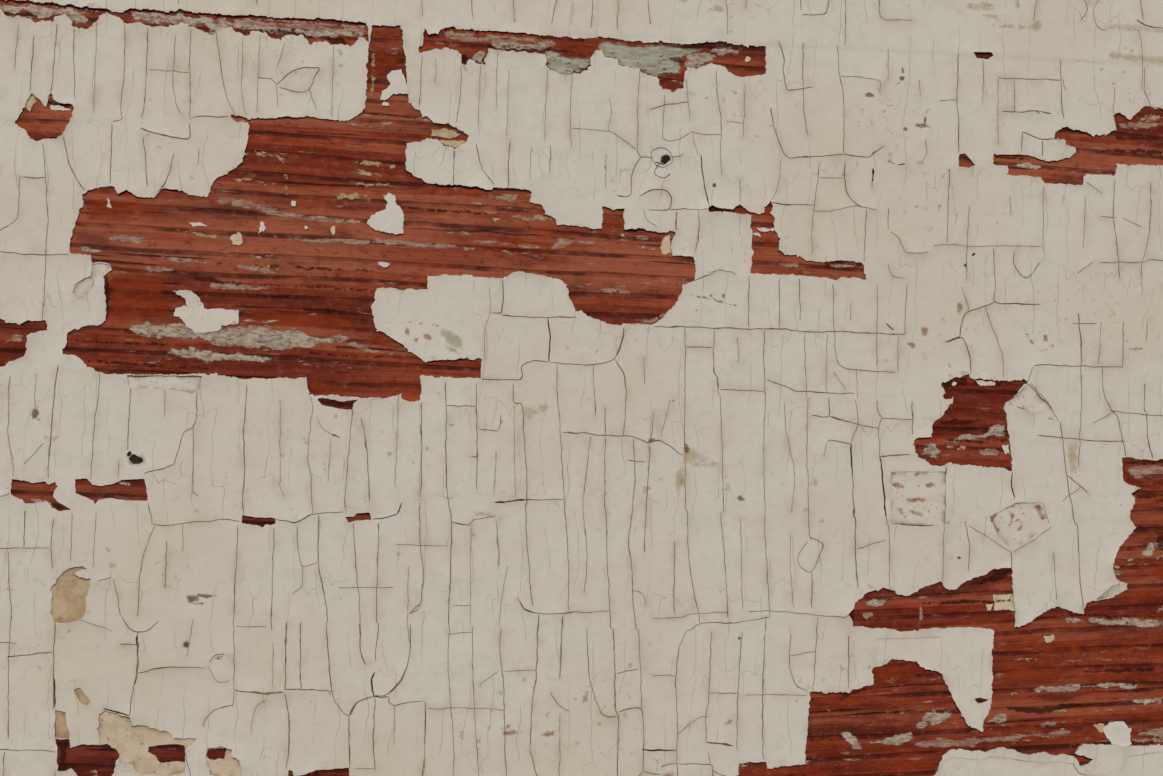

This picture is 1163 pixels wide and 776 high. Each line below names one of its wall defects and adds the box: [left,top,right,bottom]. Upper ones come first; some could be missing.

crack [0,22,334,319]
peeling [0,0,695,410]
crack [419,55,745,251]
peeling [418,27,766,92]
peeling [708,202,865,280]
crack [770,44,1044,373]
crack [982,62,1065,156]
peeling [993,106,1163,185]
crack [0,270,944,776]
peeling [737,457,1163,776]
peeling [890,374,1058,525]
crack [1016,316,1162,606]